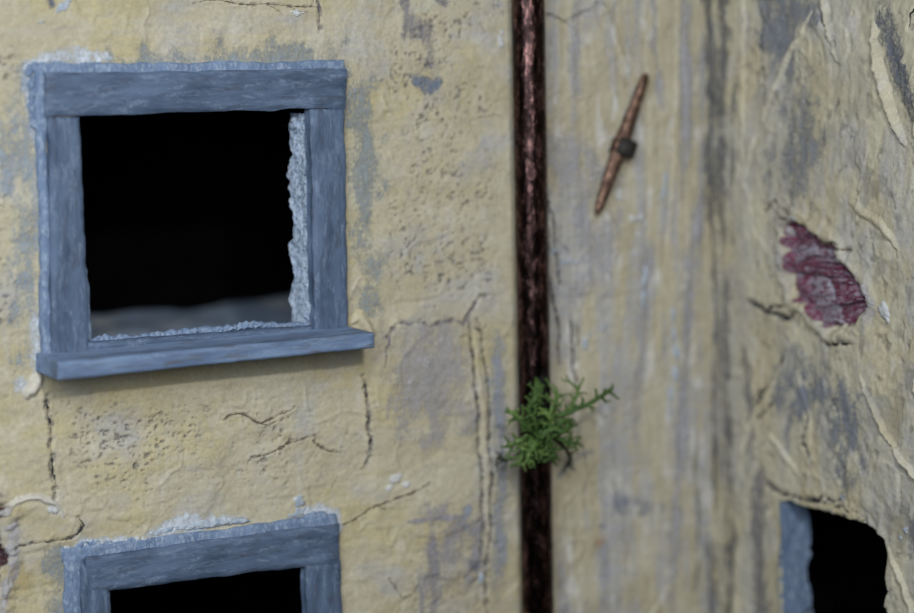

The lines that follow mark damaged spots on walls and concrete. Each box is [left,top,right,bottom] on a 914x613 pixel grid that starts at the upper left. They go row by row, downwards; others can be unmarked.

crack [200,0,321,30]
damp [759,0,826,205]
damp [875,12,914,121]
spalling [775,215,890,328]
crack [46,397,56,498]
crack [222,409,292,425]
crack [363,377,372,466]
crack [385,295,494,601]
damp [742,358,769,613]
damp [773,345,865,492]
spalling [0,543,17,599]
damp [693,527,737,613]